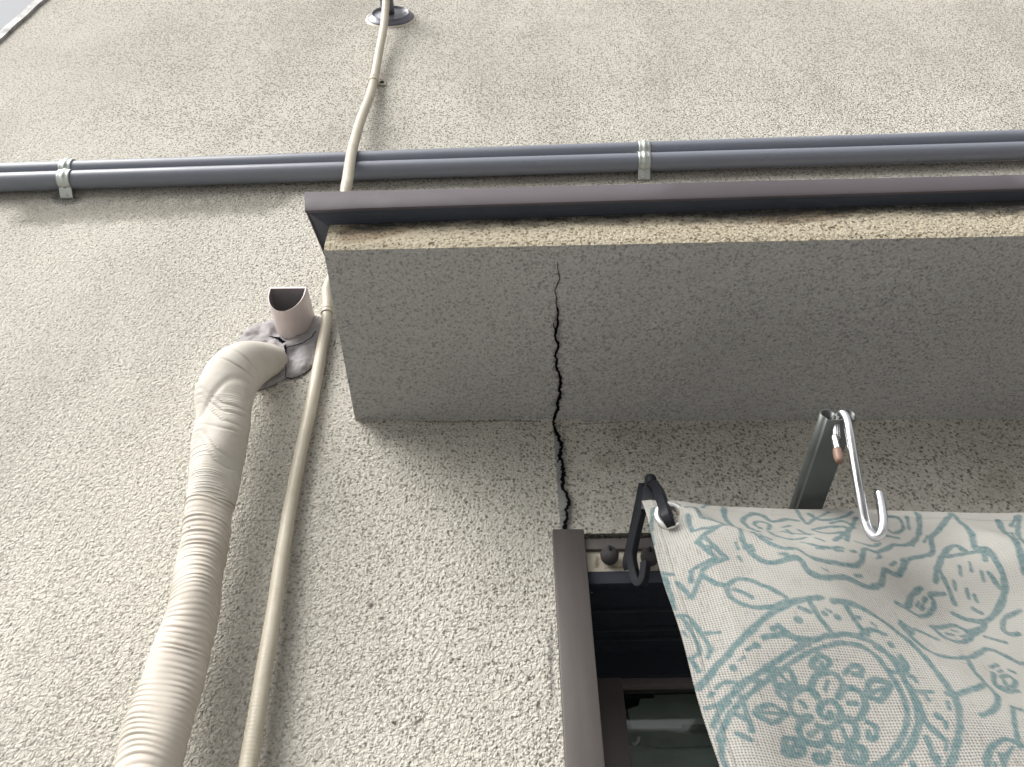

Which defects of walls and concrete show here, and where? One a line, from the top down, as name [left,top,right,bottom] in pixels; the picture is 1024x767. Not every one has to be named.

crack [552,263,573,529]